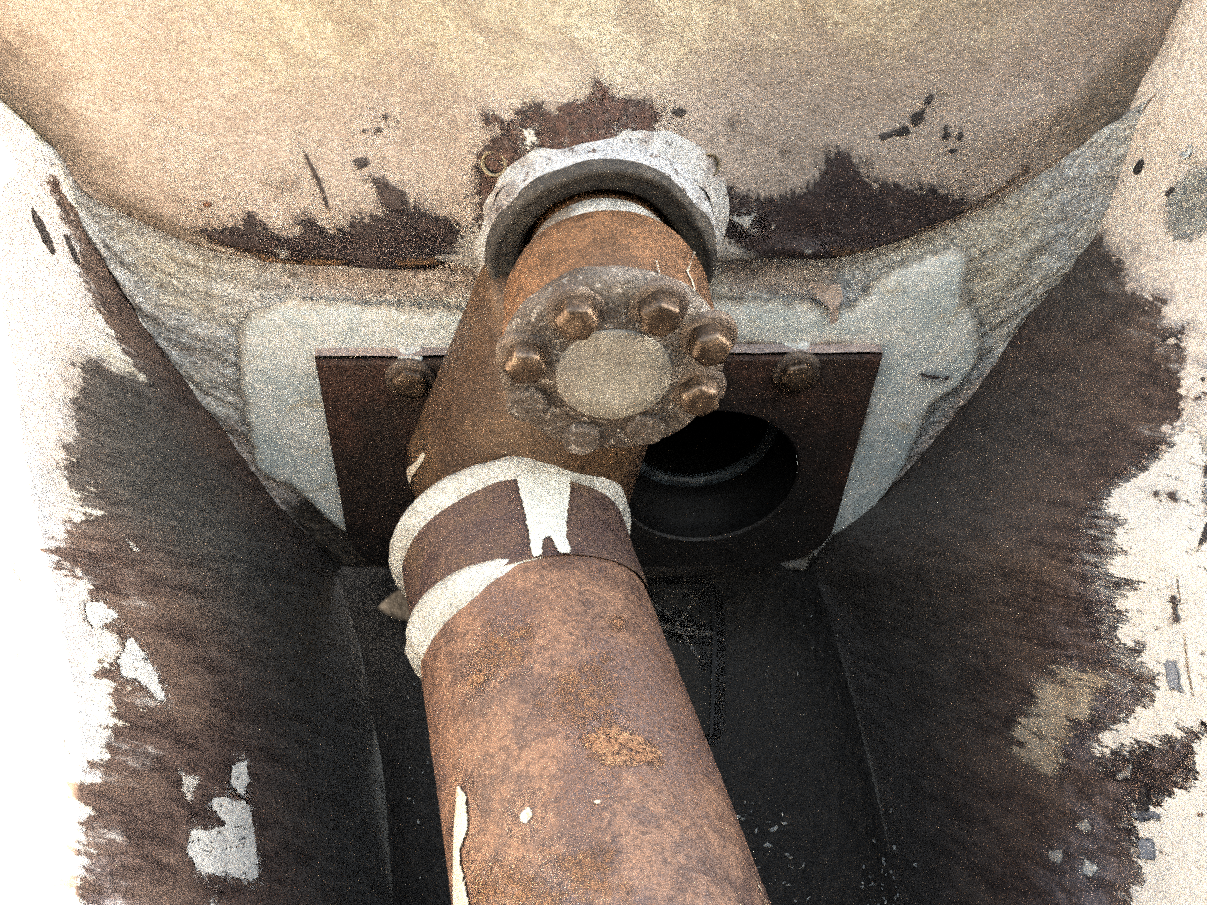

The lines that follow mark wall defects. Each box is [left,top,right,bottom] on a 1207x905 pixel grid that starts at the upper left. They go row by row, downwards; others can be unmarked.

rust [894,156,1033,242]
rust [206,235,372,269]
peeling [406,452,425,499]
peeling [85,600,118,629]
peeling [117,638,166,702]
peeling [1010,416,1207,905]
rust [580,723,665,769]
peeling [180,771,200,801]
peeling [187,760,259,882]
peeling [519,807,532,824]